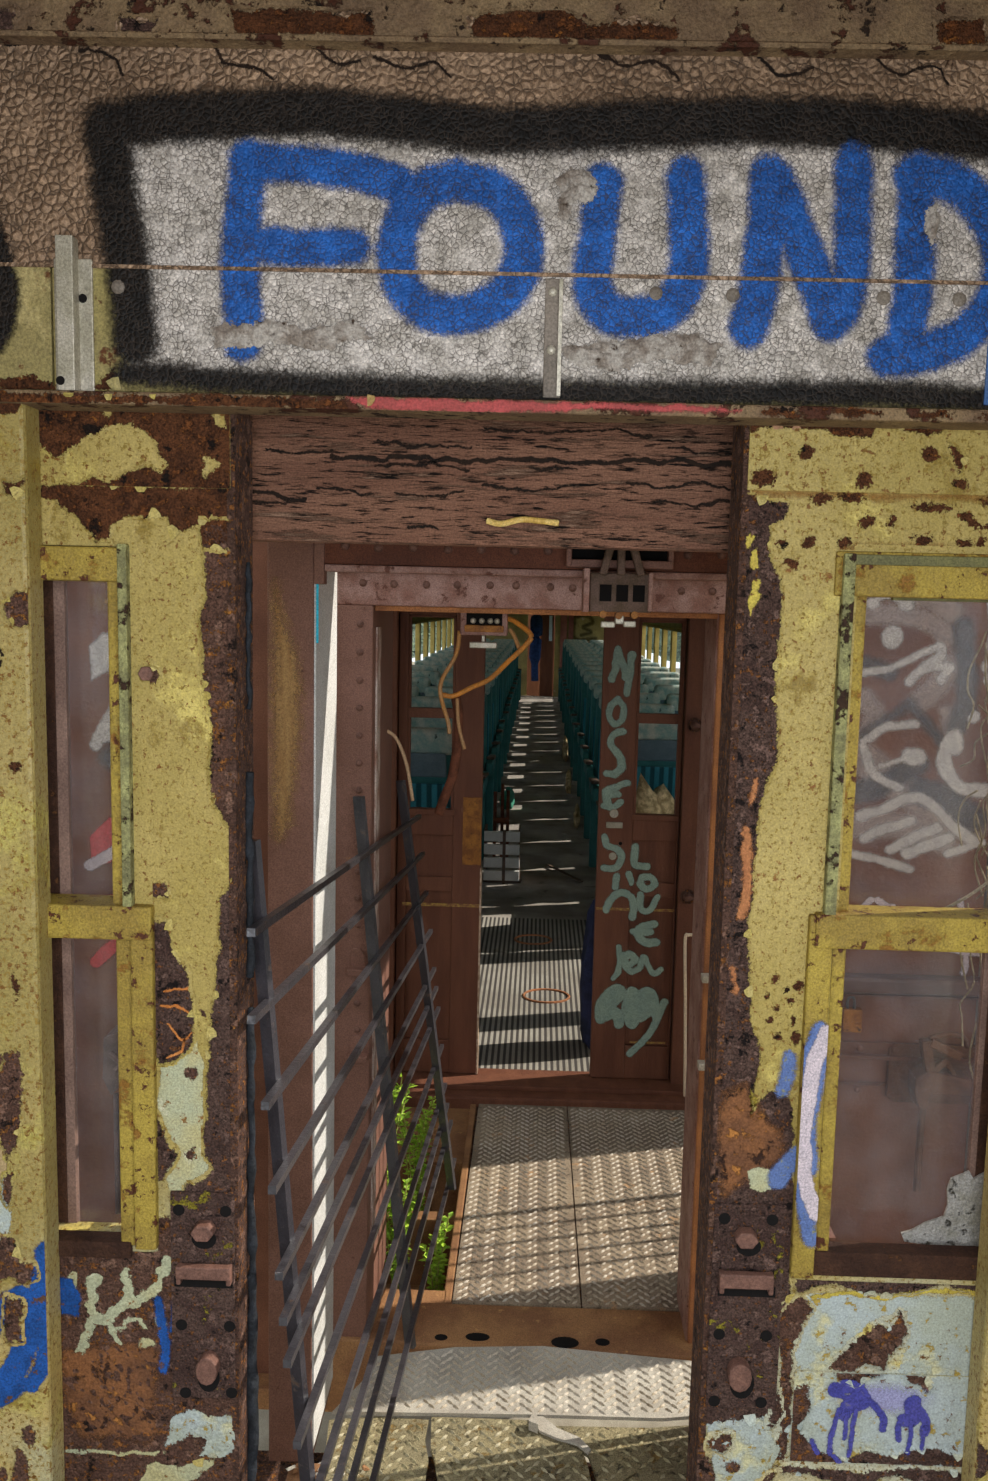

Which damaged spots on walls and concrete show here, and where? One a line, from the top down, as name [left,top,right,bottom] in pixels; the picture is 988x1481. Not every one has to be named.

rust [225,5,381,37]
rust [0,368,348,836]
rust [701,406,988,1481]
rust [152,878,232,1191]
peeling [0,1146,12,1240]
rust [0,1049,28,1209]
peeling [157,1041,208,1192]
rust [0,1233,41,1347]
peeling [68,1255,171,1355]
rust [59,1215,232,1481]
peeling [65,1409,235,1481]
peeling [706,1287,975,1481]